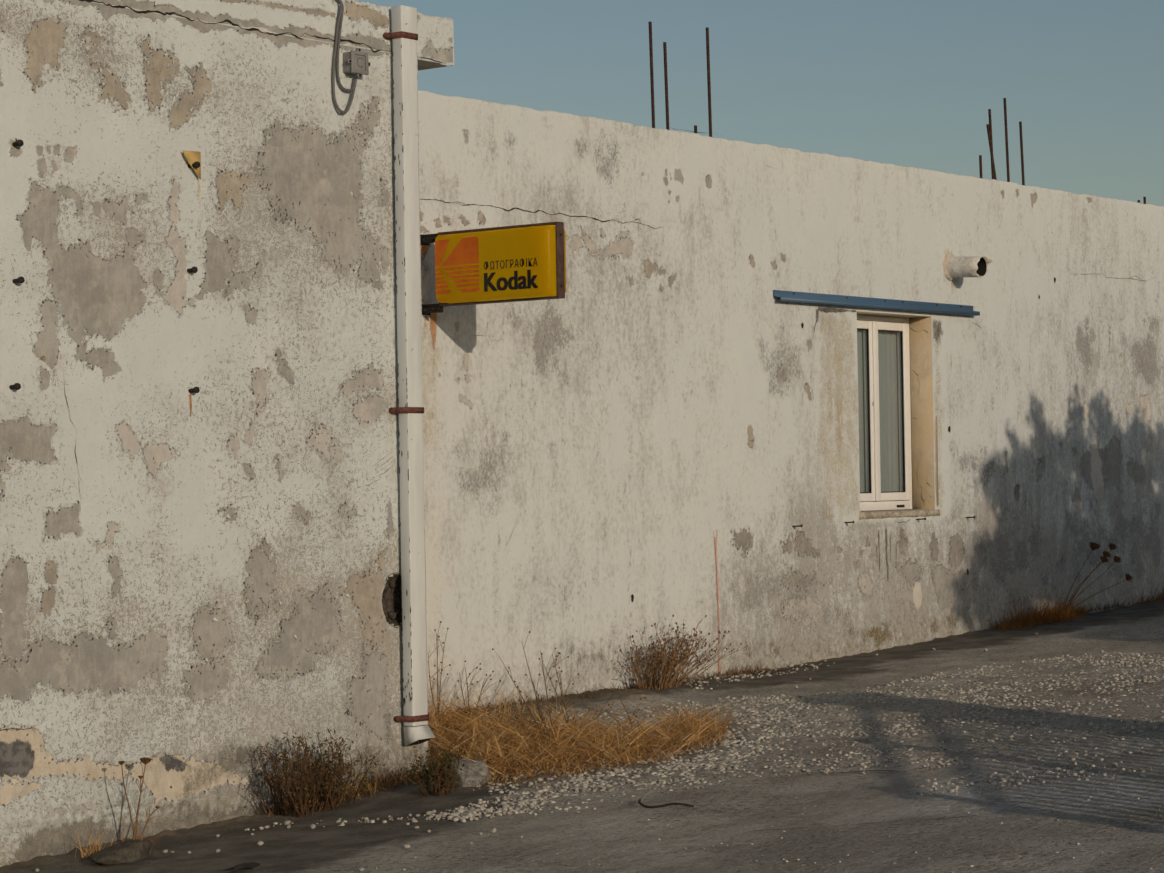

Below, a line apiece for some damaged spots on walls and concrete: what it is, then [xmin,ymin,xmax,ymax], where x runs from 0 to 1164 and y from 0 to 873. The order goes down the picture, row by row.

peeling [22,0,392,132]
crack [79,0,391,52]
peeling [8,137,263,393]
peeling [212,95,390,292]
rust [425,313,437,347]
crack [420,199,661,229]
peeling [0,414,59,504]
peeling [223,346,295,484]
peeling [0,500,169,709]
peeling [241,499,402,682]
damp [879,529,897,580]
peeling [0,723,249,809]